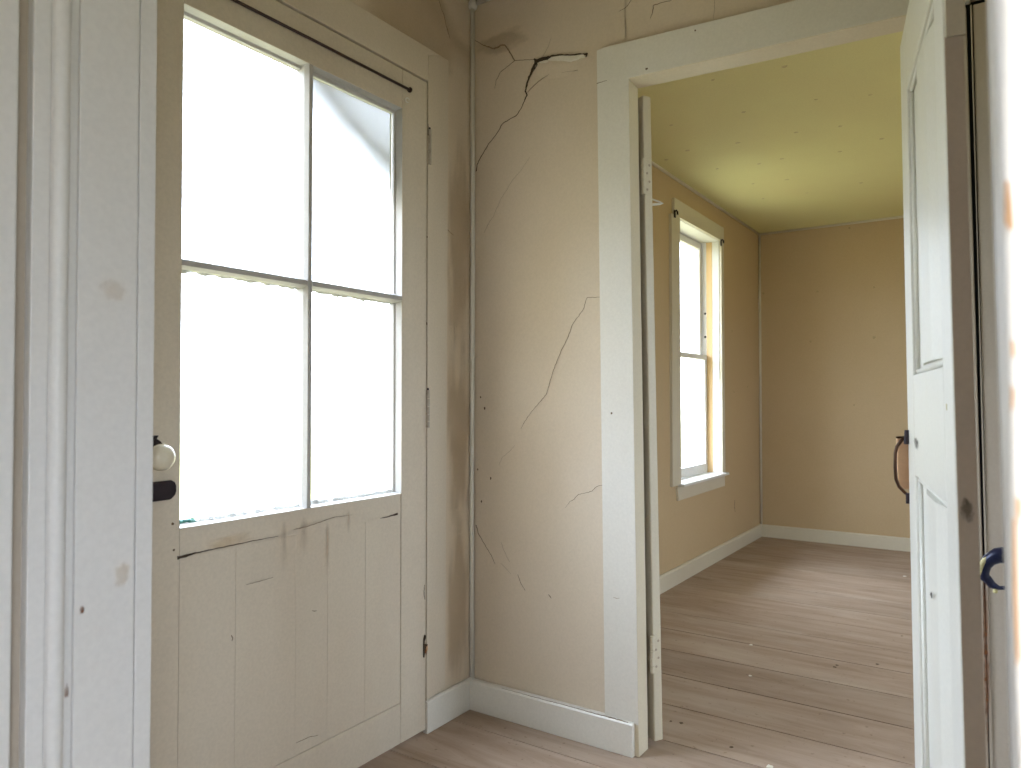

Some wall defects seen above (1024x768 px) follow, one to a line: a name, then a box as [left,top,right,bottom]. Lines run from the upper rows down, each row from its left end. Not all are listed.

crack [475,39,588,171]
crack [499,297,597,464]